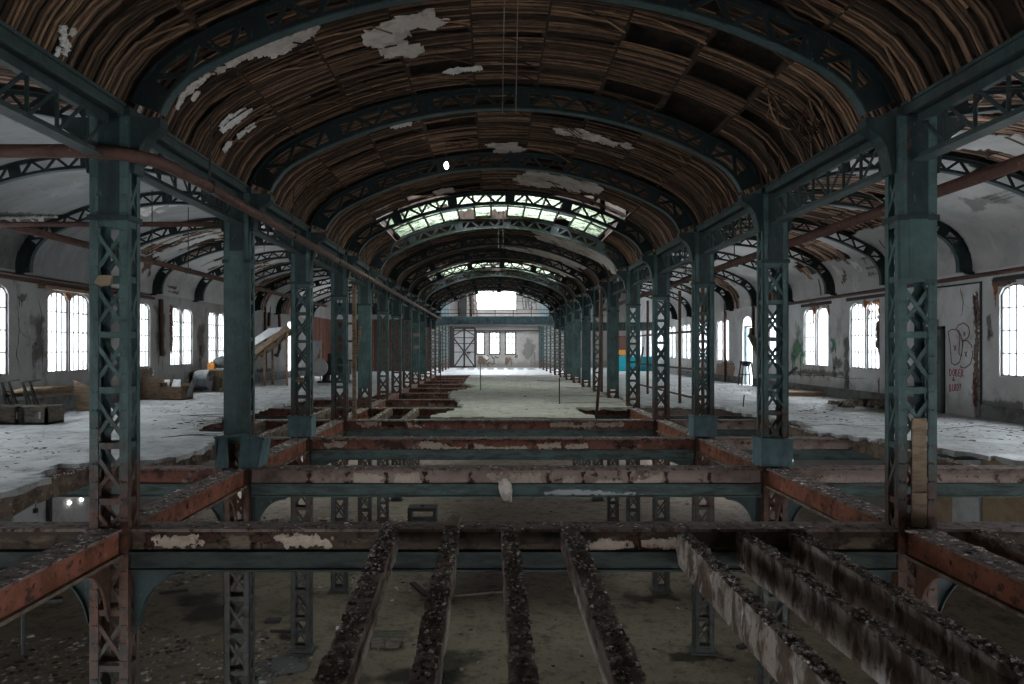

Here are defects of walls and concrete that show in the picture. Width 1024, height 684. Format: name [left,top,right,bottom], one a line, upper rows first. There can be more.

peeling [361,8,450,59]
peeling [175,25,321,110]
peeling [218,107,256,153]
peeling [553,128,634,150]
peeling [513,171,604,194]
spalling [971,292,980,418]
corrosion [381,421,406,450]
peeling [151,534,205,549]
peeling [273,532,334,549]